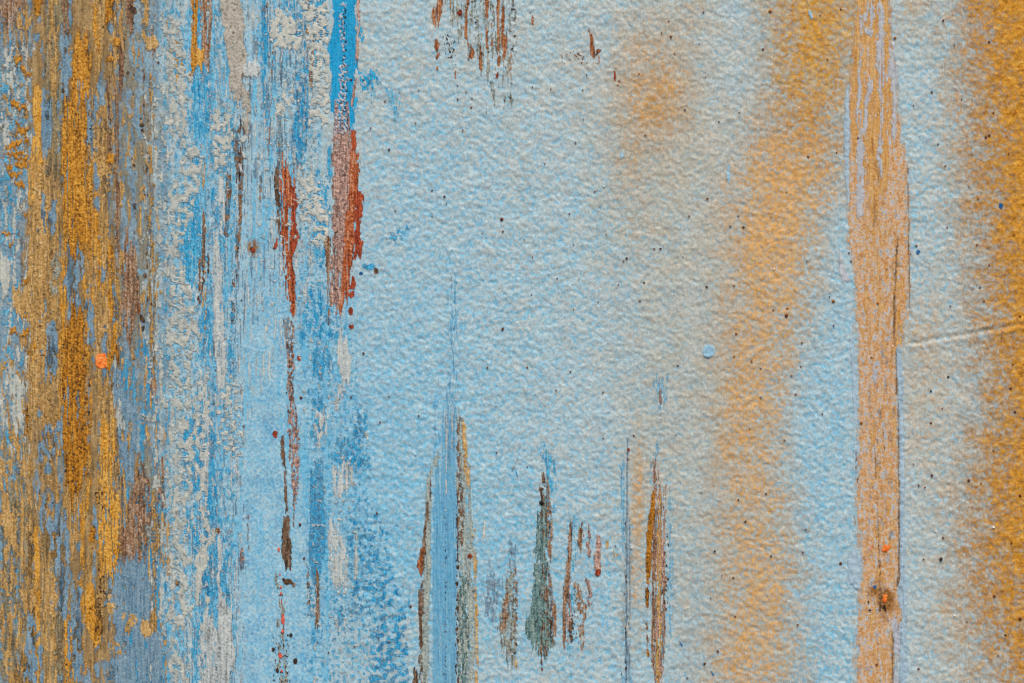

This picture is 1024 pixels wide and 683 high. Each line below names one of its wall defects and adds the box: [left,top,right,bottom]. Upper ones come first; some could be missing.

peeling [0,47,32,206]
peeling [0,230,32,437]
peeling [107,0,419,683]
peeling [0,457,15,544]
peeling [416,547,426,577]